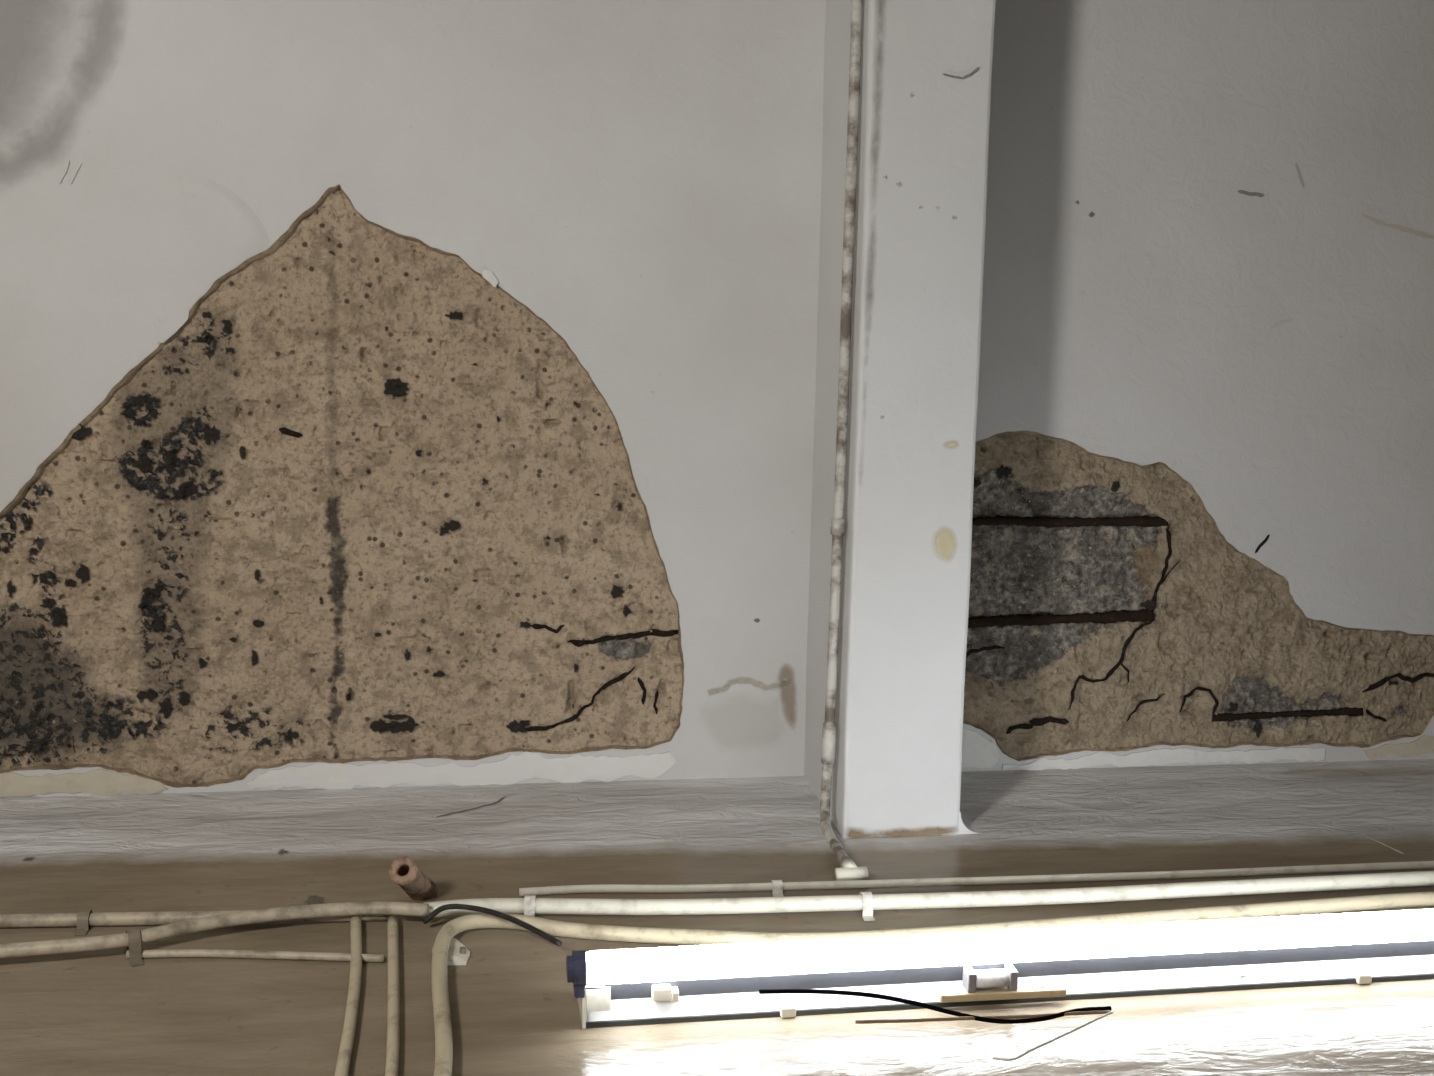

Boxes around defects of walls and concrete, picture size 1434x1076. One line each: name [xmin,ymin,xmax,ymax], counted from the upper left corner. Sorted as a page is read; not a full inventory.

spalling [0,184,684,798]
spalling [962,431,1434,770]